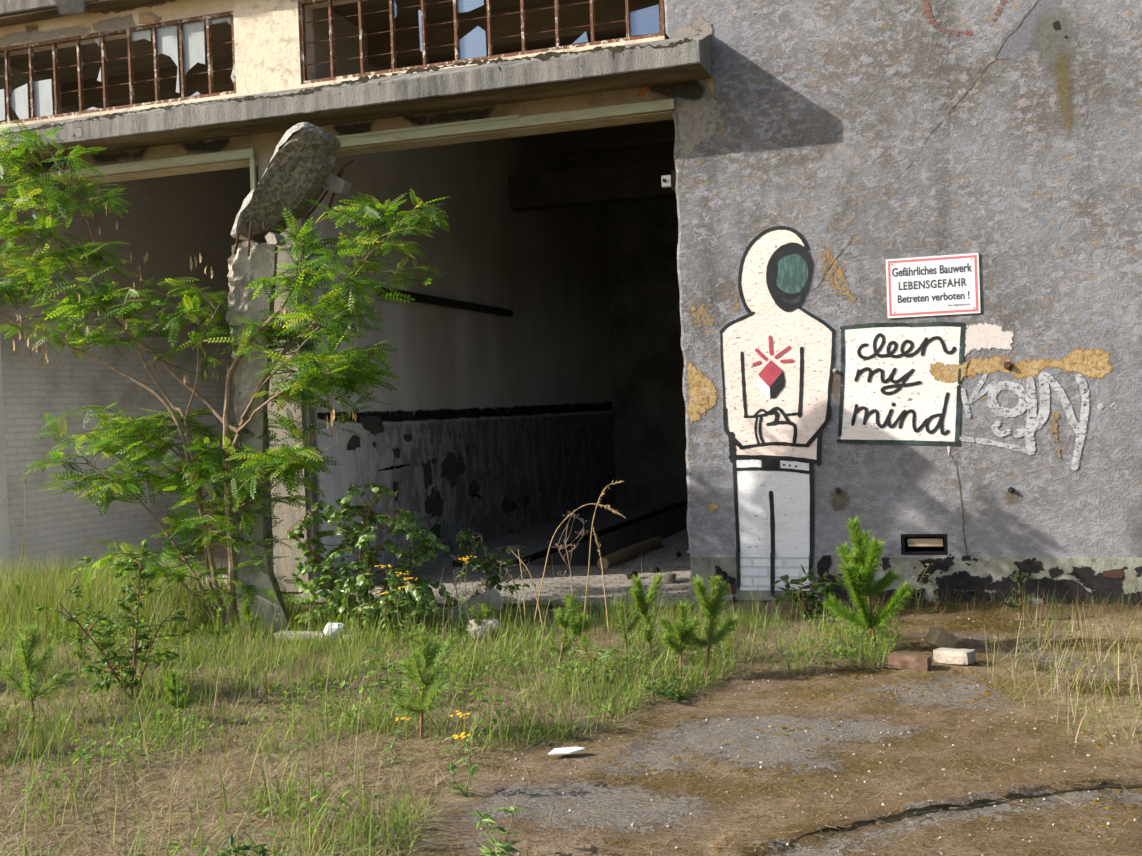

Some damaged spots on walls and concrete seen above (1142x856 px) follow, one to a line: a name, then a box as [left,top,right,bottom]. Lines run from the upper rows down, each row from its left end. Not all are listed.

crack [879,1,1038,202]
peeling [950,344,1115,387]
peeling [686,361,721,423]
peeling [347,416,385,451]
peeling [391,433,412,459]
peeling [422,445,480,539]
peeling [870,554,1142,605]